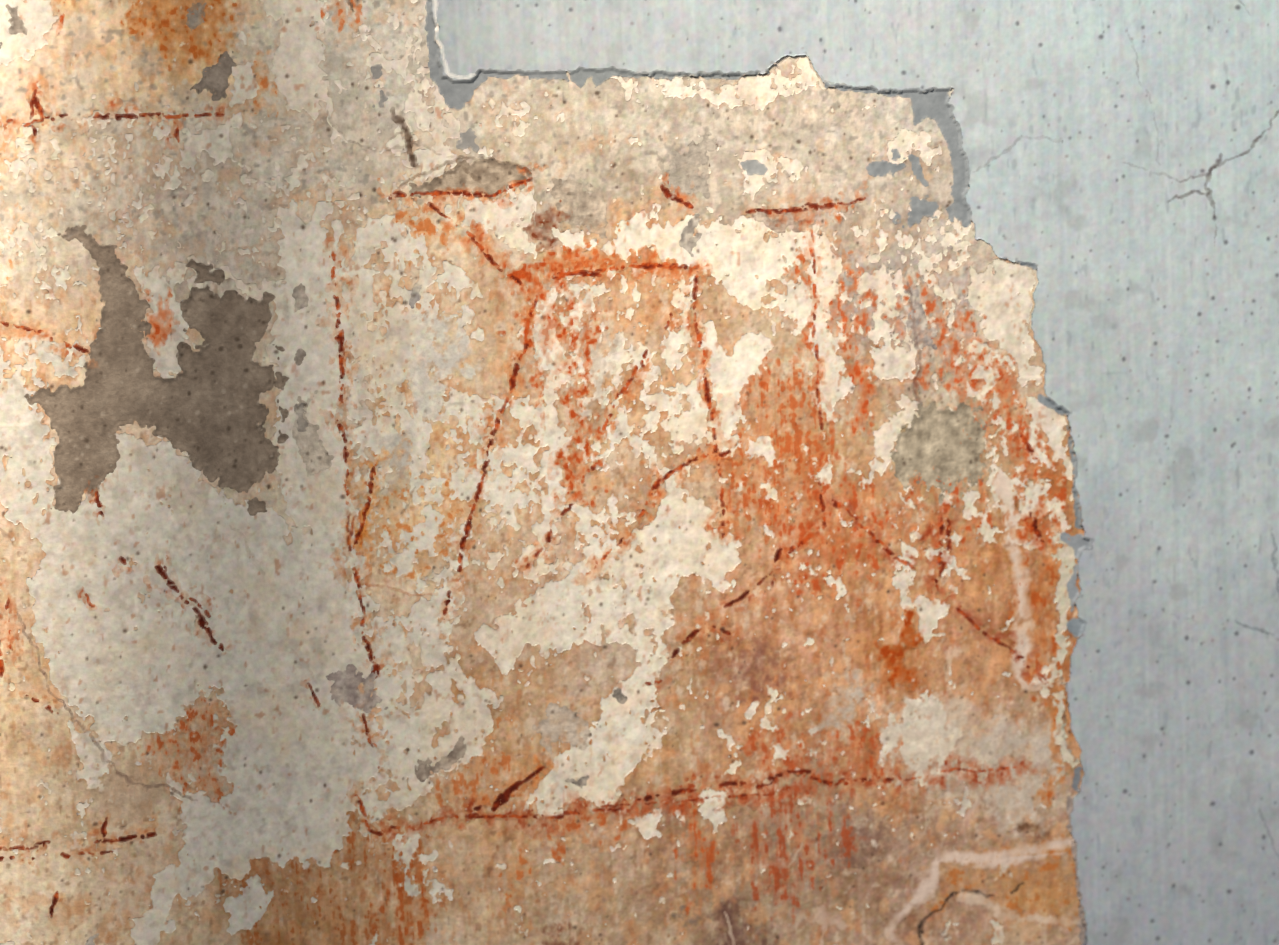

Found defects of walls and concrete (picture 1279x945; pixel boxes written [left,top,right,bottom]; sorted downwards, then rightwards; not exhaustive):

flaking render [186,2,207,31]
crack [1122,28,1279,247]
spalling [537,268,567,309]
spalling [989,391,1001,409]
spalling [743,460,780,502]
spalling [448,516,466,542]
rust [214,162,1079,945]
spalling [770,737,789,771]
spalling [795,783,828,856]
crack [917,882,1025,945]